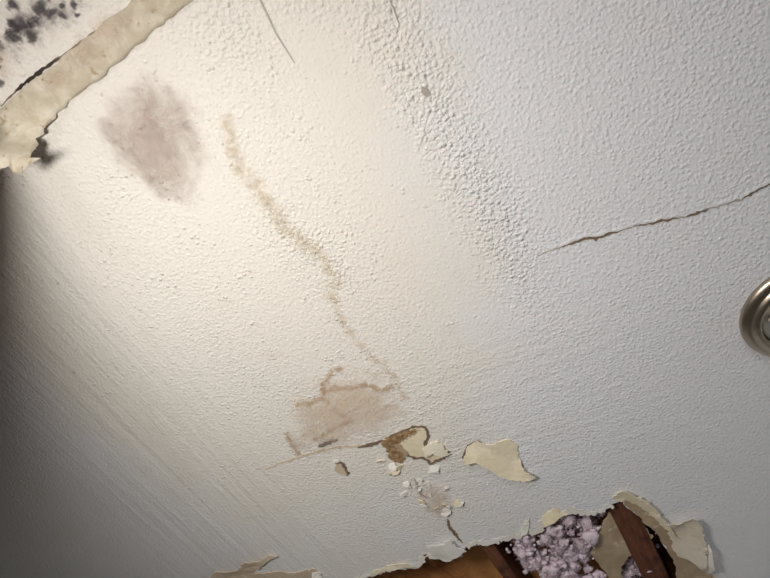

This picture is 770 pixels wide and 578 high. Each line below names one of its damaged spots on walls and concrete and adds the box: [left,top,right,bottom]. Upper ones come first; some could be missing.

damp [0,0,79,68]
crack [537,180,770,256]
peeling [332,460,349,476]
peeling [542,508,569,527]
peeling [427,540,467,562]
peeling [368,563,413,576]